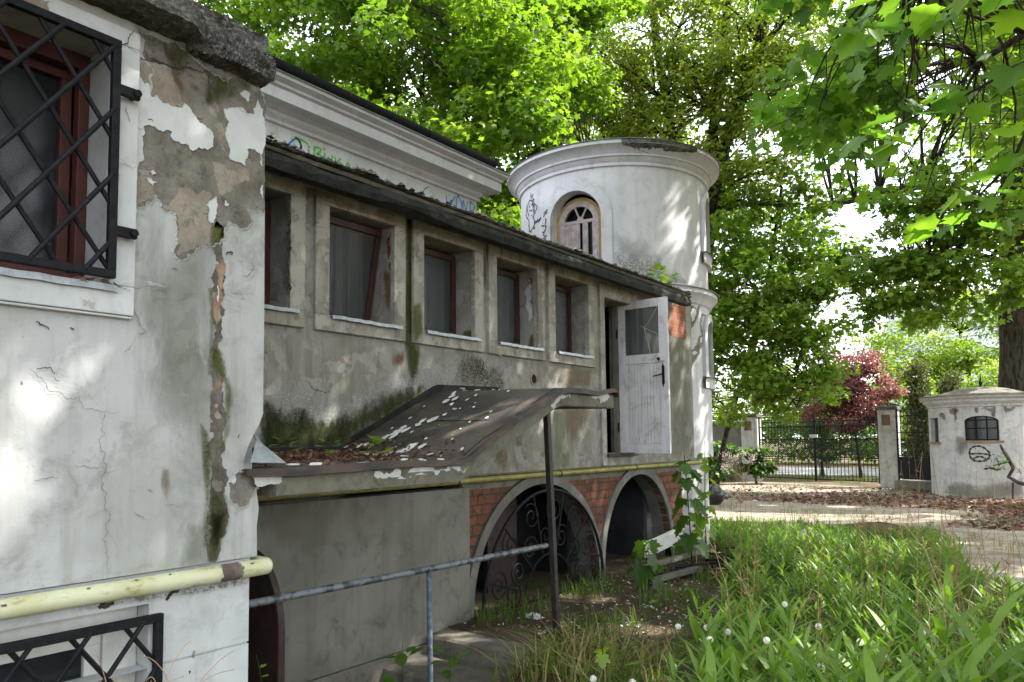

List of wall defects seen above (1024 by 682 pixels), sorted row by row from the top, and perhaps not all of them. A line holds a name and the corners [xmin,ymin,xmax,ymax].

peeling [135,26,282,562]
water stain [265,249,503,447]
crack [30,367,118,569]
water stain [188,428,228,561]
peeling [374,459,468,479]